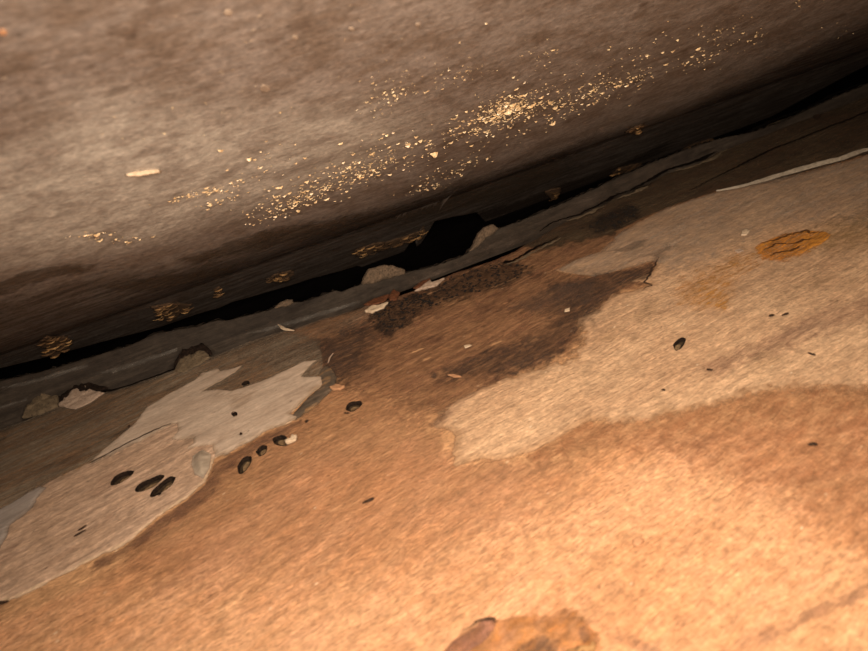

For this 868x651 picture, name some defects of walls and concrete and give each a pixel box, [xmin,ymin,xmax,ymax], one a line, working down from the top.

water stain [0,29,868,509]
crack [503,111,868,264]
rust [756,229,830,260]
peeling [0,360,337,601]